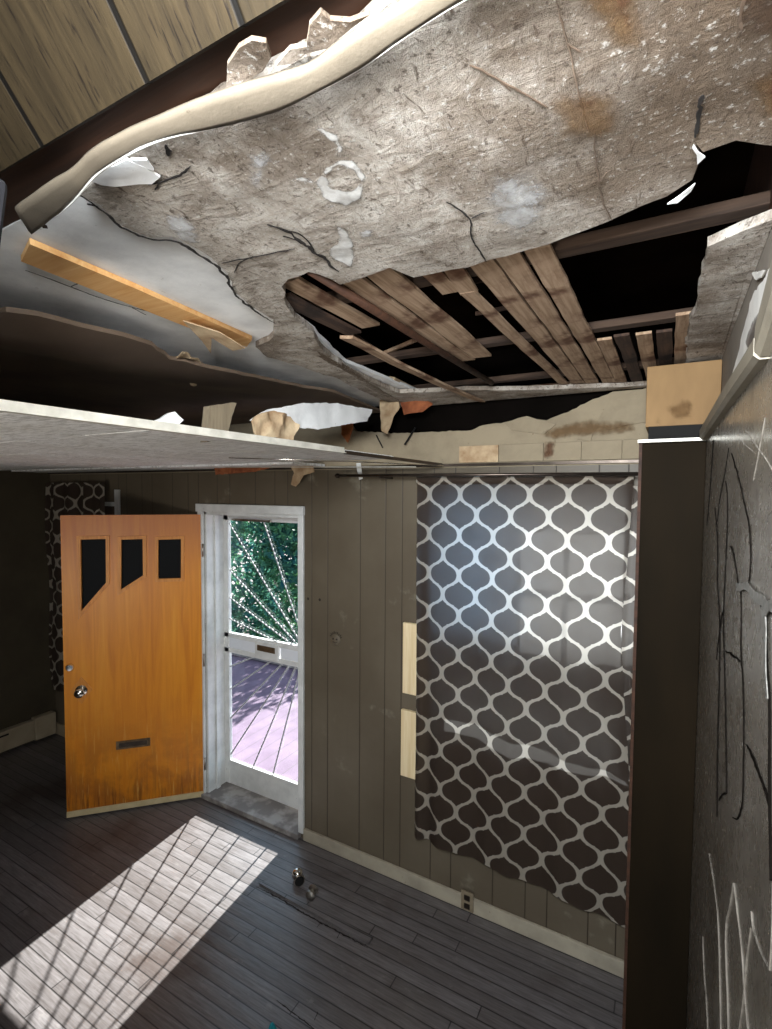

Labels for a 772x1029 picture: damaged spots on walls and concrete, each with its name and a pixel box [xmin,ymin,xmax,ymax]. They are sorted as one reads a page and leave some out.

damp [559,94,612,134]
peeling [667,183,695,205]
crack [80,195,339,323]
peeling [733,269,769,372]
peeling [504,416,556,434]
crack [706,440,772,881]